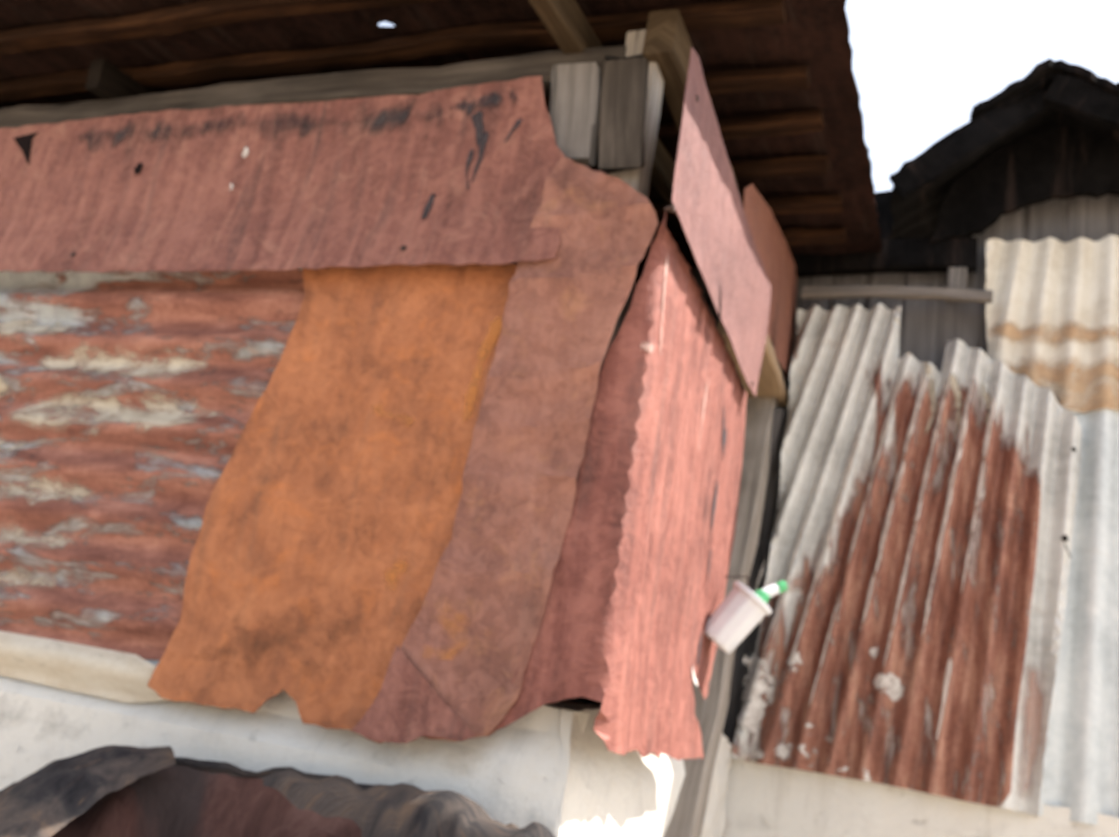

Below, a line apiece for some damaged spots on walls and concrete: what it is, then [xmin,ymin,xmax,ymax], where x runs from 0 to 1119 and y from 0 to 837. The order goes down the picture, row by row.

rust [0,269,305,703]
rust [731,362,1043,807]
rust [994,323,1116,342]
rust [1009,362,1119,412]